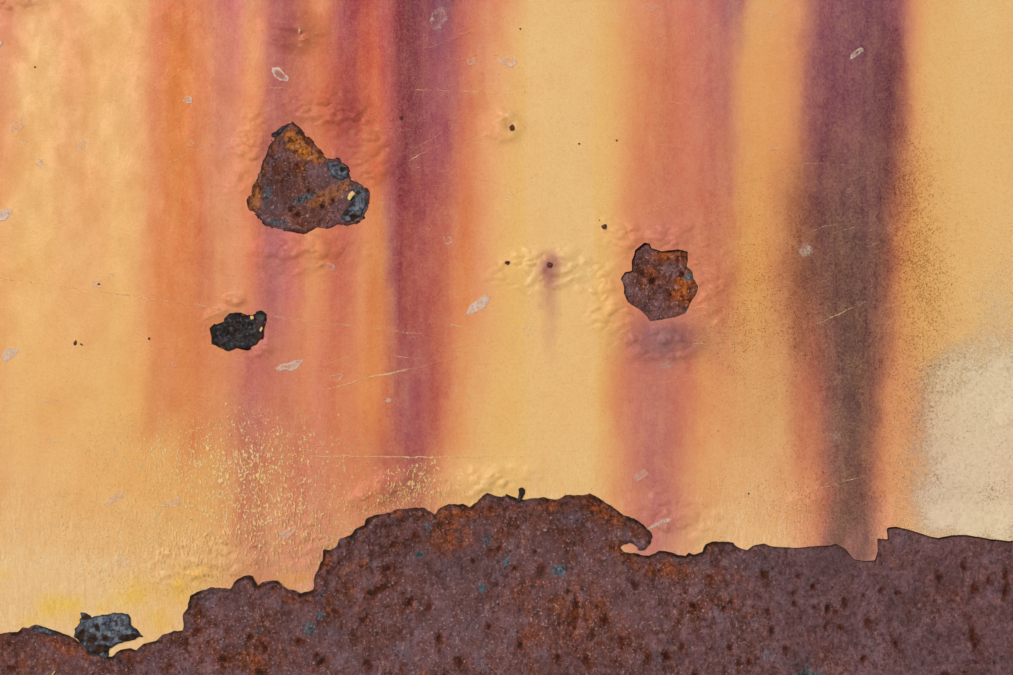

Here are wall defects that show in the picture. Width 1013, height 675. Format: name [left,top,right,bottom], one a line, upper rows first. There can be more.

peeling [209,310,267,351]
peeling [247,122,370,234]
rust [396,0,423,313]
peeling [621,243,698,321]
rust [803,7,901,544]
peeling [0,403,1013,675]